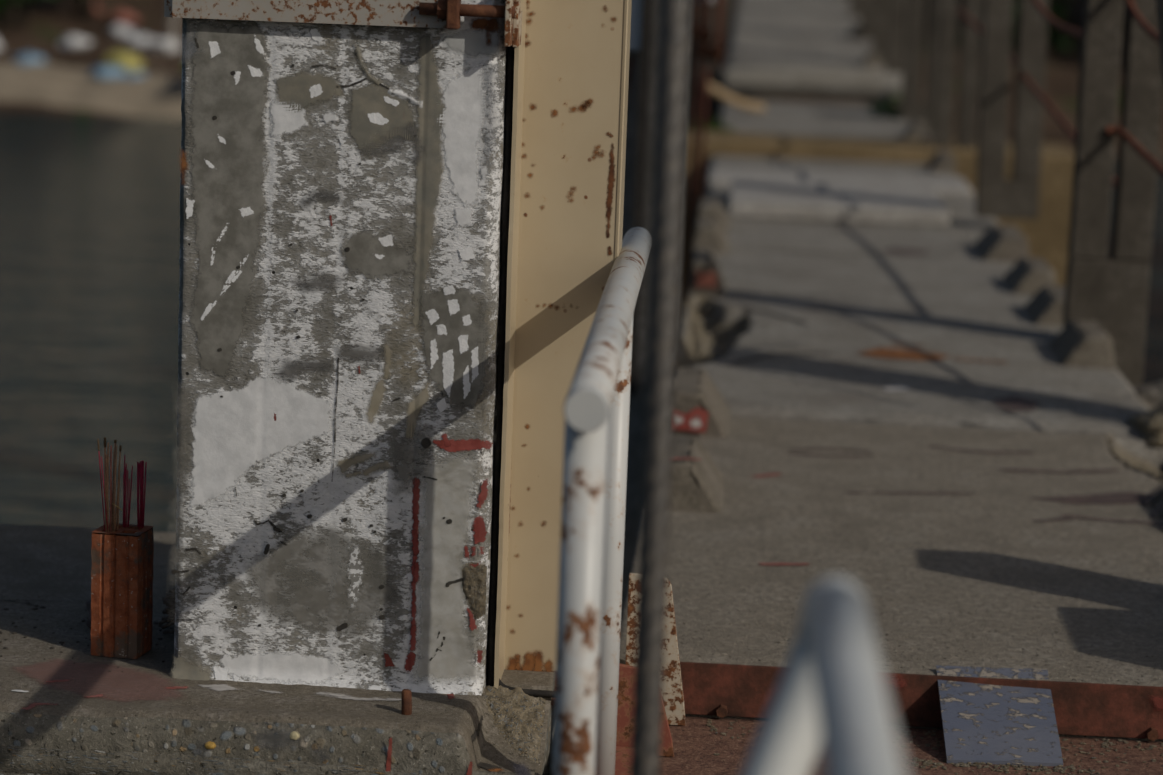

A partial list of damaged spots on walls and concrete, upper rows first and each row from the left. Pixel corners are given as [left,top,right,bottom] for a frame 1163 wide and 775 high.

corrosion [471,18,499,45]
corrosion [592,132,615,255]
peeling [185,22,490,413]
peeling [476,479,488,508]
spalling [446,545,487,631]
peeling [172,657,240,681]
corrosion [507,652,556,672]